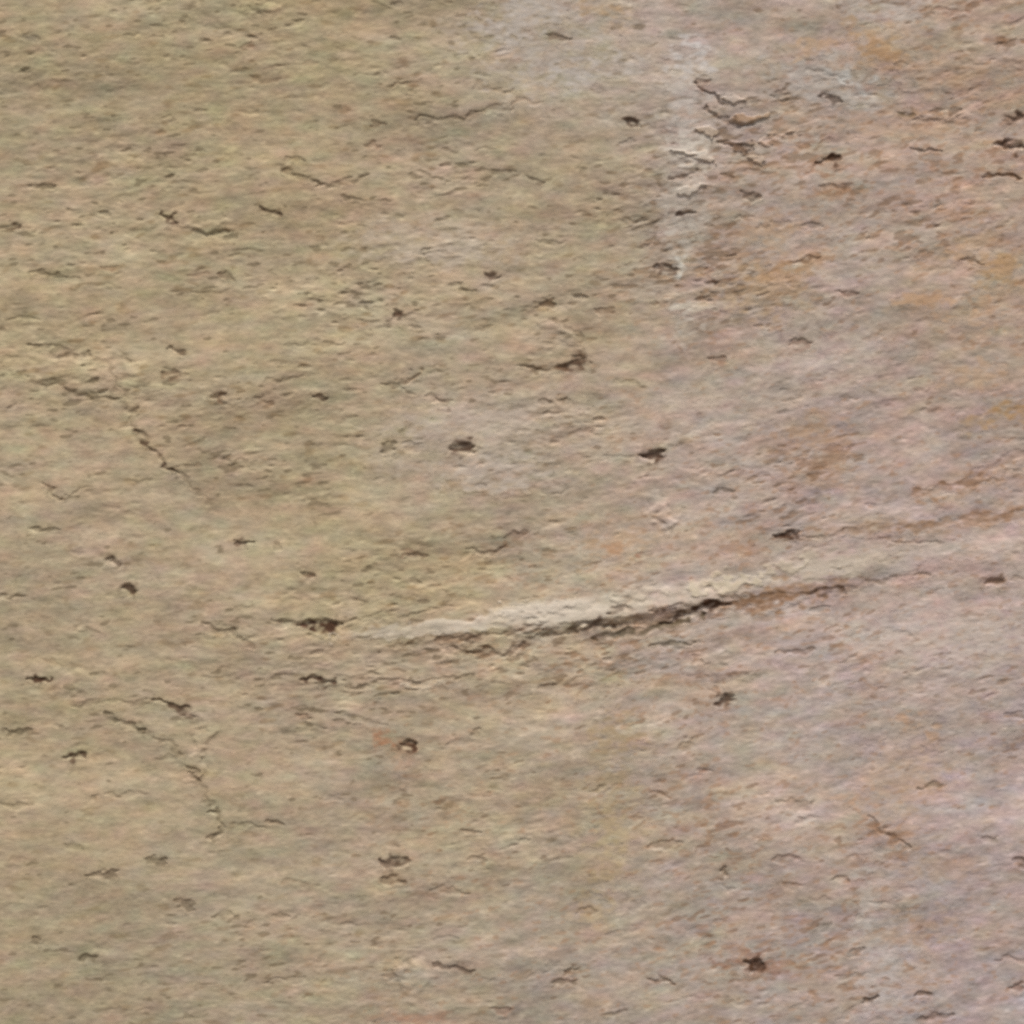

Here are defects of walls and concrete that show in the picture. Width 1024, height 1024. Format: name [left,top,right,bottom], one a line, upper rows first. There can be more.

crack [200,449,1024,688]